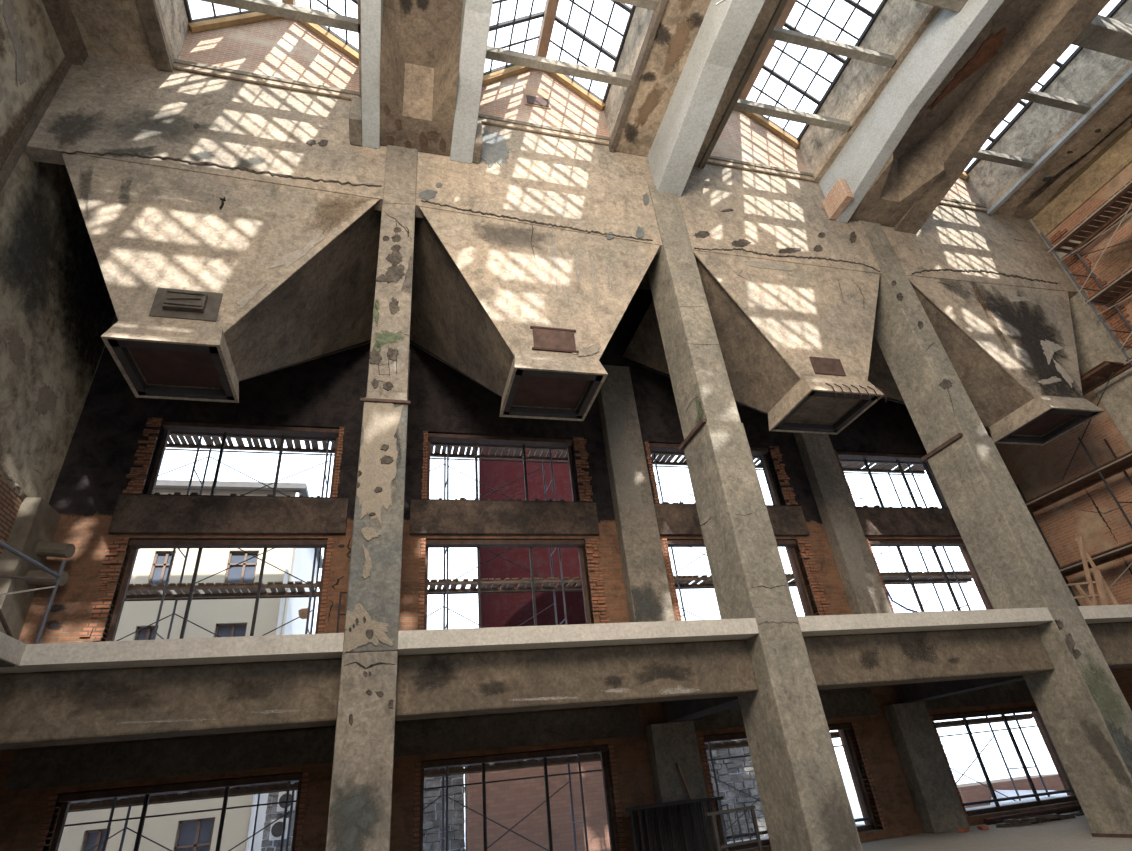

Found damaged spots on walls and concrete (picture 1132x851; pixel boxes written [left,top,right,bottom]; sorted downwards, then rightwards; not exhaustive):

damp [49,114,97,145]
spalling [375,227,405,283]
spalling [389,297,400,315]
spalling [369,348,399,365]
peeling [356,379,404,579]
peeling [343,603,394,655]
damp [481,683,505,695]
damp [643,664,692,694]